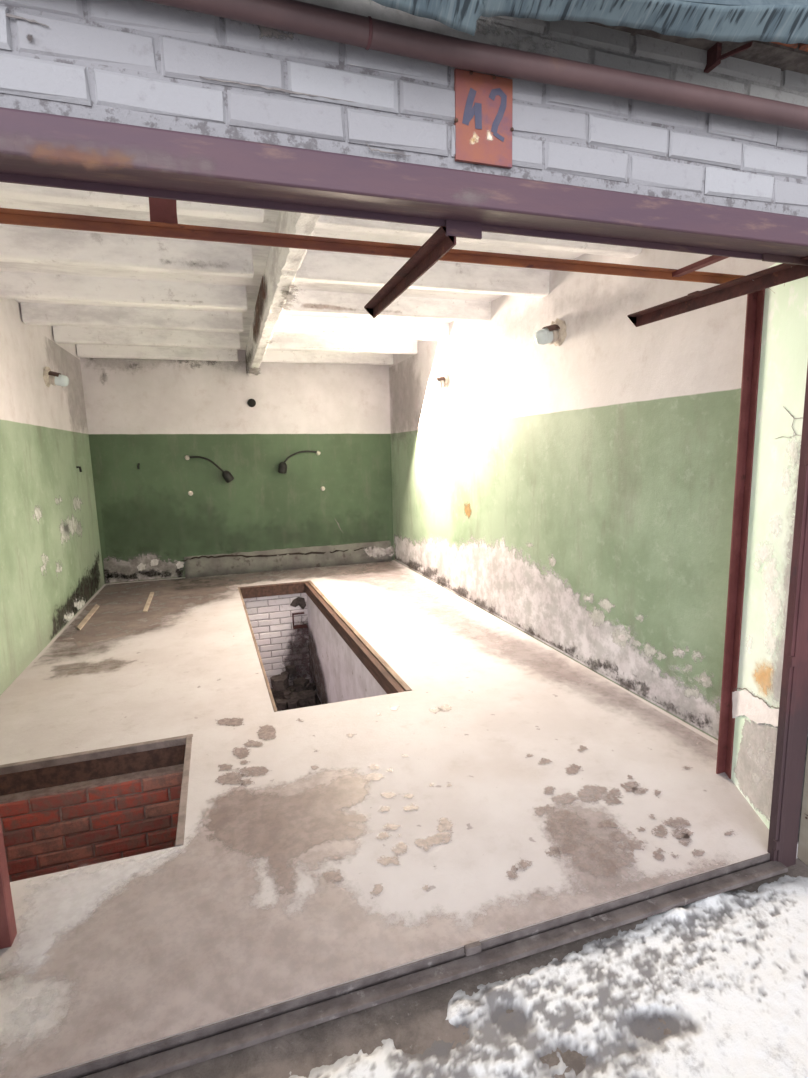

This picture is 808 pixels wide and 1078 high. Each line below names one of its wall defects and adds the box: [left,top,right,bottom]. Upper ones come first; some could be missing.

peeling [103,553,184,583]
damp [47,551,711,745]
peeling [364,438,800,819]
corrosion [755,667,771,694]
damp [0,725,725,1078]